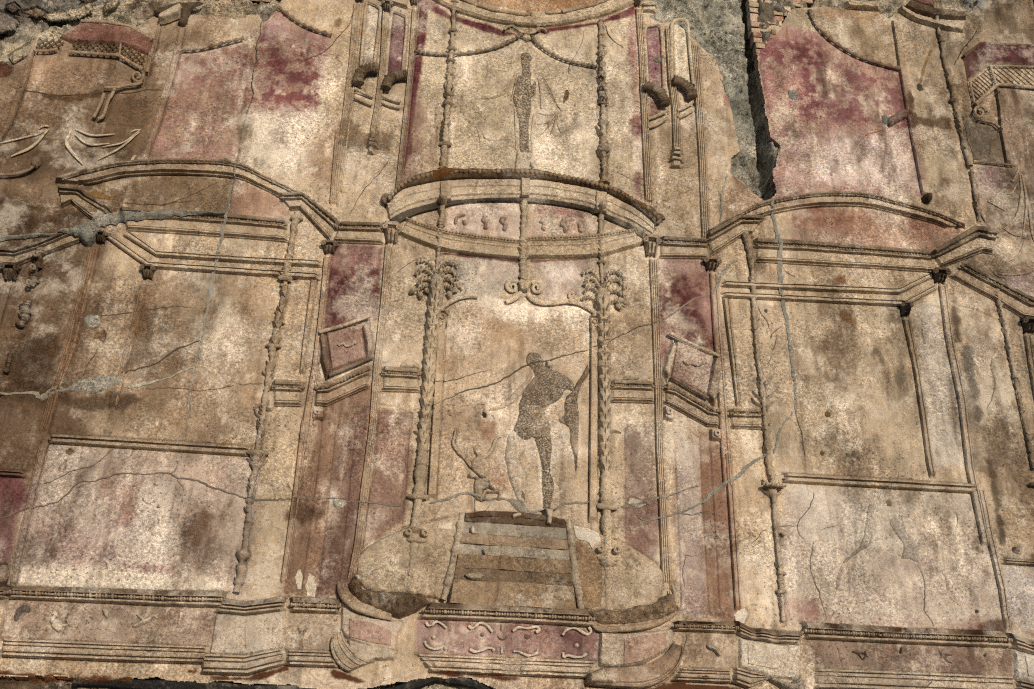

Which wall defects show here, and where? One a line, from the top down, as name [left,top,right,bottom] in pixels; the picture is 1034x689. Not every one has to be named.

spalling [0,61,13,77]
crack [84,165,261,412]
damp [840,310,856,327]
crack [0,385,65,399]
crack [621,199,805,521]
crack [0,449,401,518]
crack [430,492,590,513]
crack [753,491,837,618]